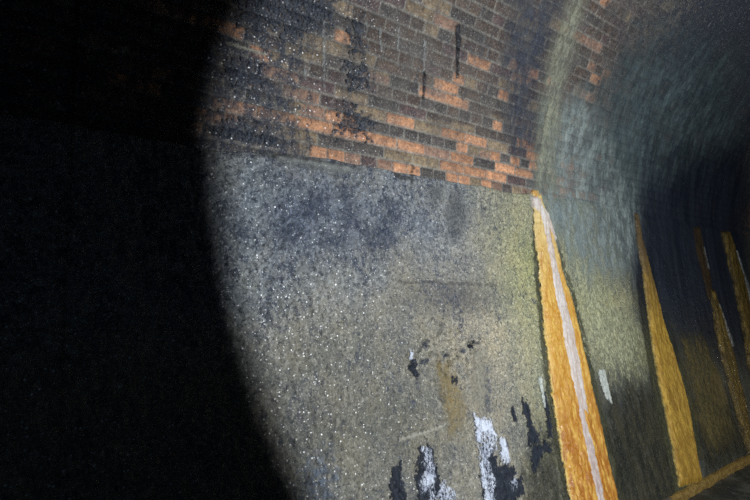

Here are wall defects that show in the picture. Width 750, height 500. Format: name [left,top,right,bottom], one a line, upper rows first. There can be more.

spalling [387,460,407,500]
peeling [414,443,456,500]
peeling [473,412,525,500]
spalling [512,397,553,474]